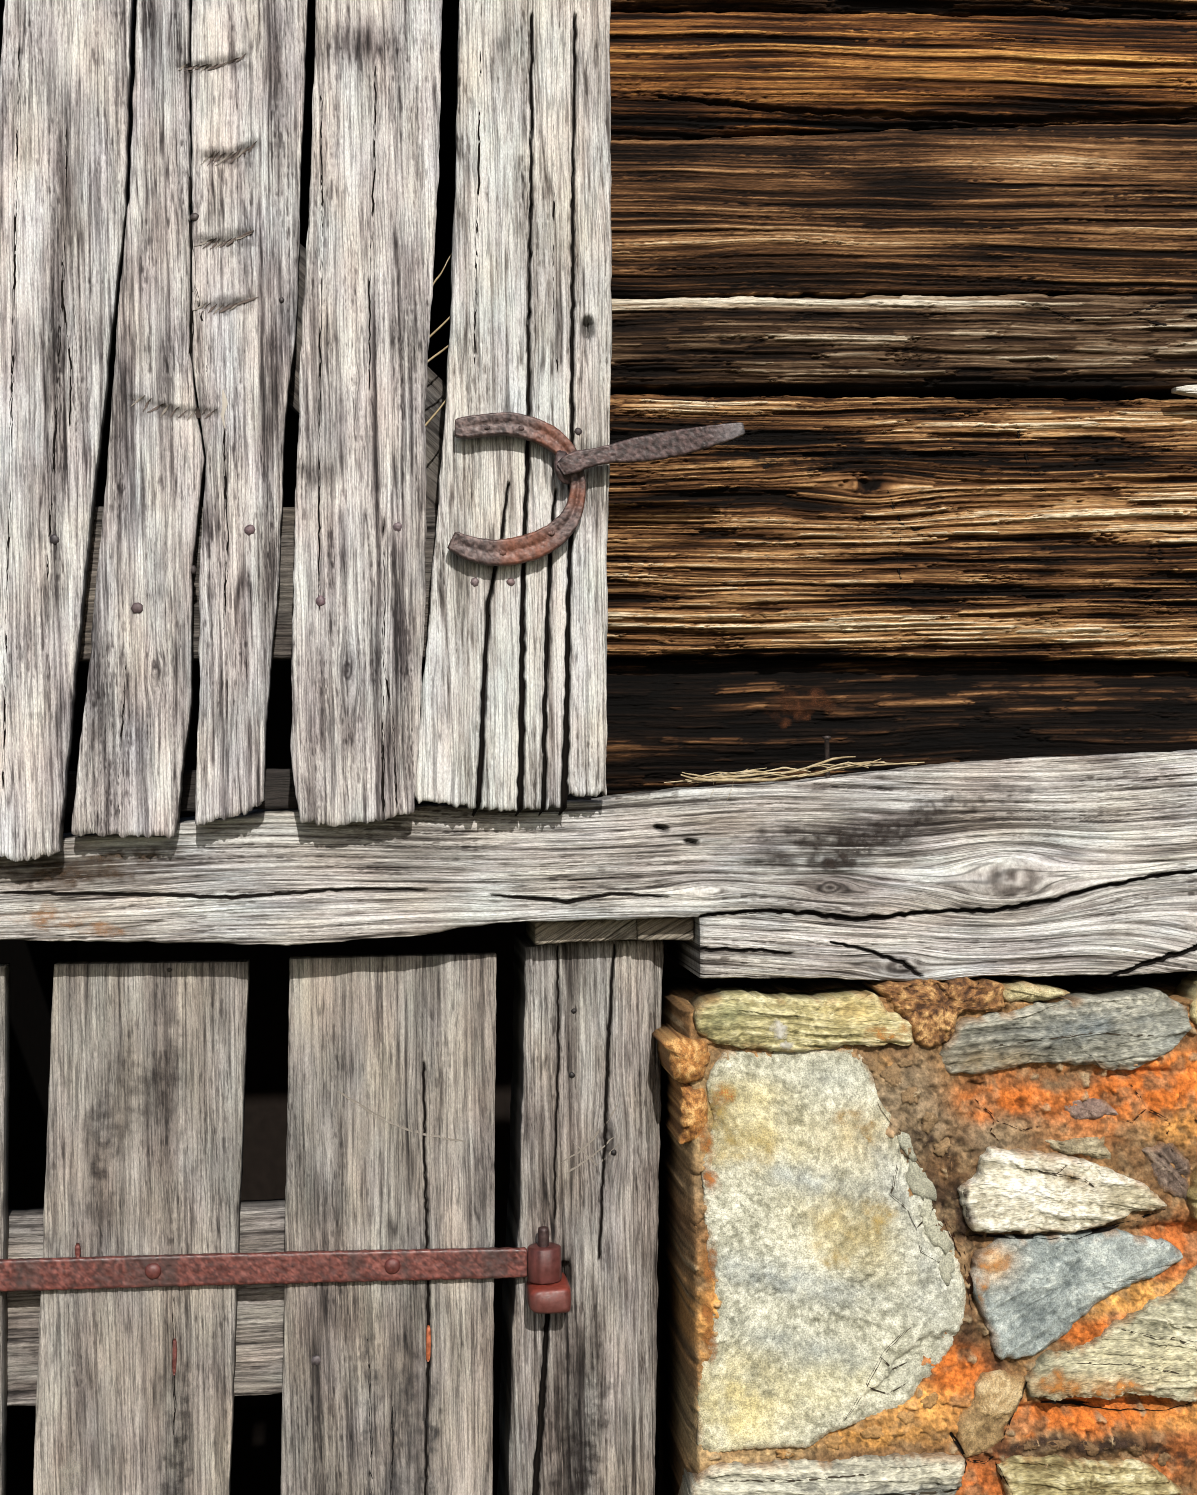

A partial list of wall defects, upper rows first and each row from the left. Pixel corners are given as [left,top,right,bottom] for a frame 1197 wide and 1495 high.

crack [472,15,576,817]
crack [6,888,424,899]
crack [491,893,664,904]
crack [700,870,1197,978]
crack [599,944,616,1258]
crack [366,1064,430,1495]
crack [533,1314,551,1495]